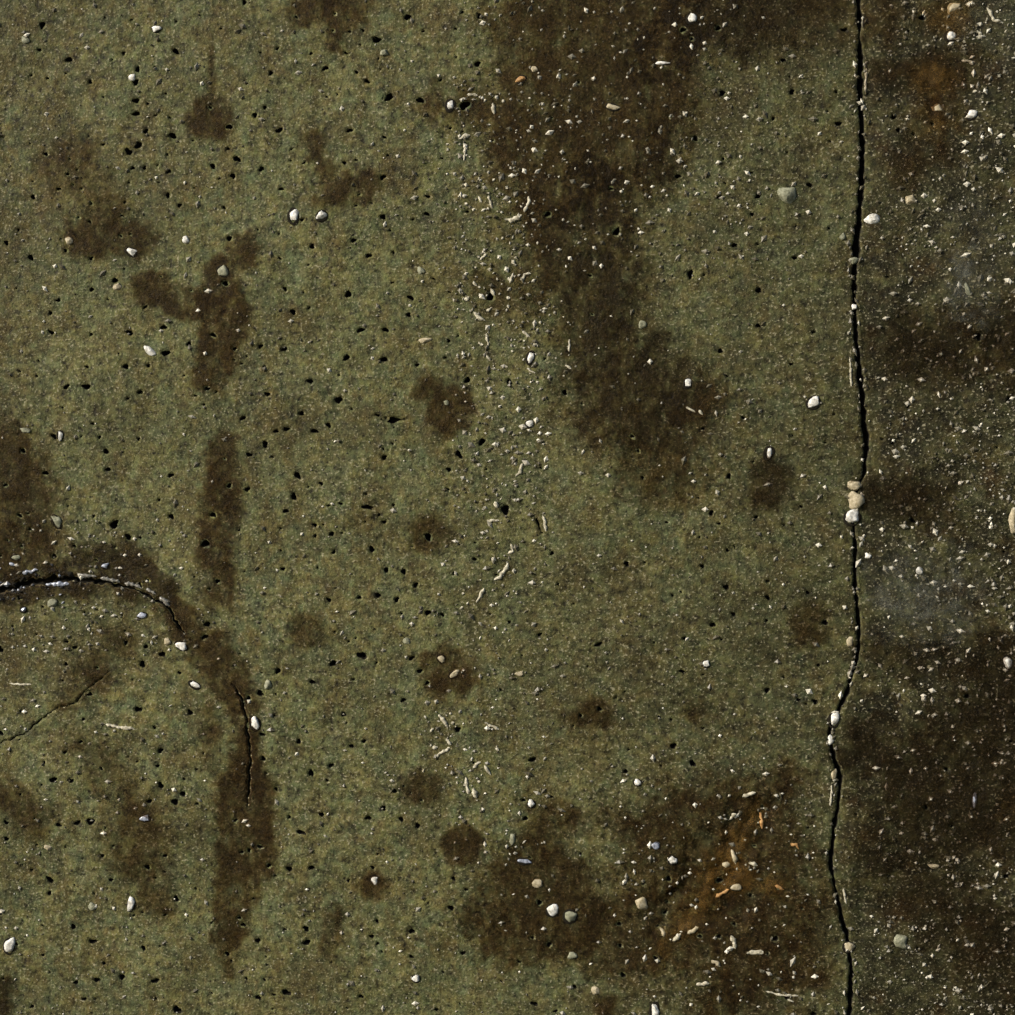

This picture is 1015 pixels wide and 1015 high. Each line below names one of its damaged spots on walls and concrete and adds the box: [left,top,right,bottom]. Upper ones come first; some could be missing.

damp [453,0,769,440]
crack [825,0,873,1015]
crack [0,562,191,640]
damp [4,544,226,672]
damp [494,544,514,587]
crack [0,670,110,746]
crack [230,682,255,806]
damp [546,863,573,921]
damp [739,938,798,1002]